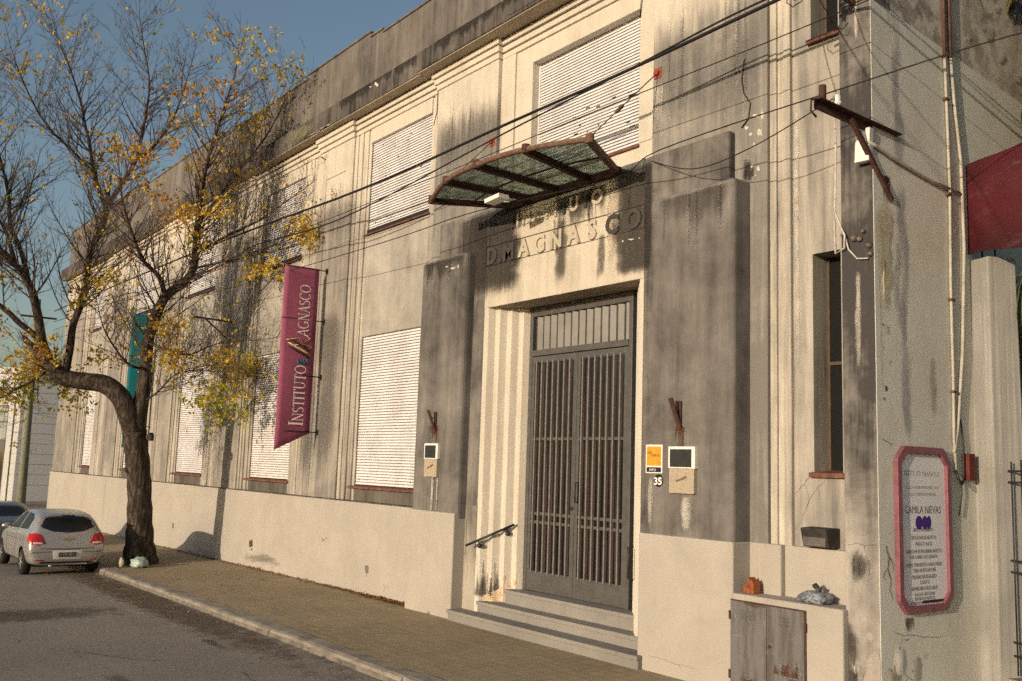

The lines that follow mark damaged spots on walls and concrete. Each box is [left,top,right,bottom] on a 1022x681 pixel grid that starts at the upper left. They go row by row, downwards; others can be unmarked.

damp [434,0,515,50]
damp [341,54,417,108]
damp [902,363,910,429]
damp [476,579,499,596]